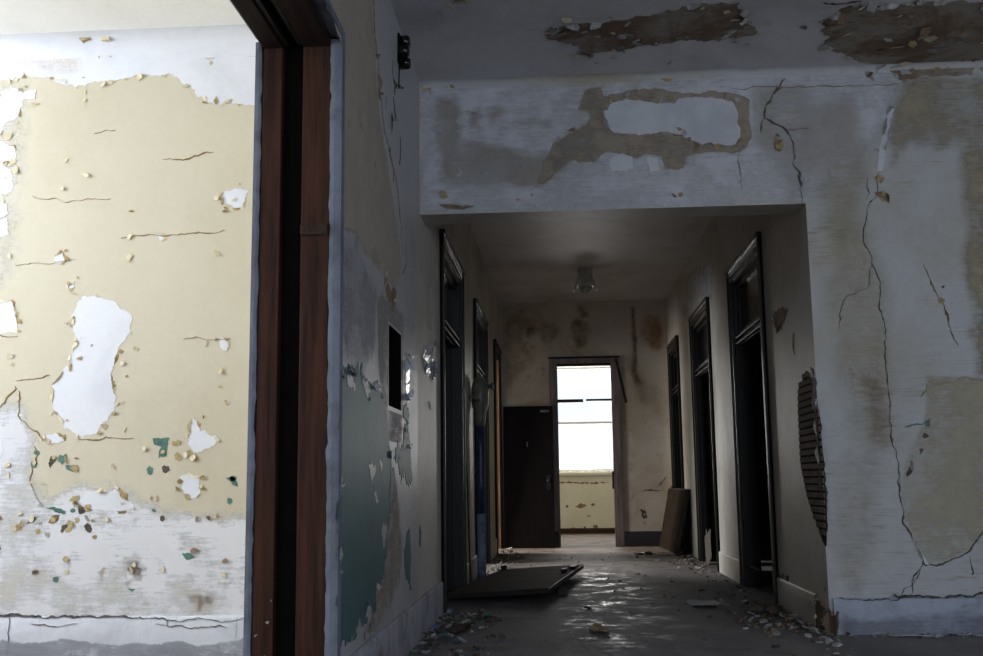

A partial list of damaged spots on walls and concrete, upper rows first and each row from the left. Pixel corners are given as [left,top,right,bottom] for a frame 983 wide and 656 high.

peeling [0,54,255,237]
crack [163,151,213,161]
peeling [420,0,983,211]
crack [731,79,905,201]
crack [121,231,218,239]
peeling [0,299,22,334]
peeling [0,486,135,539]
peeling [31,276,139,473]
peeling [142,415,220,475]
peeling [334,270,438,646]
crack [839,173,983,601]
crack [0,613,244,643]